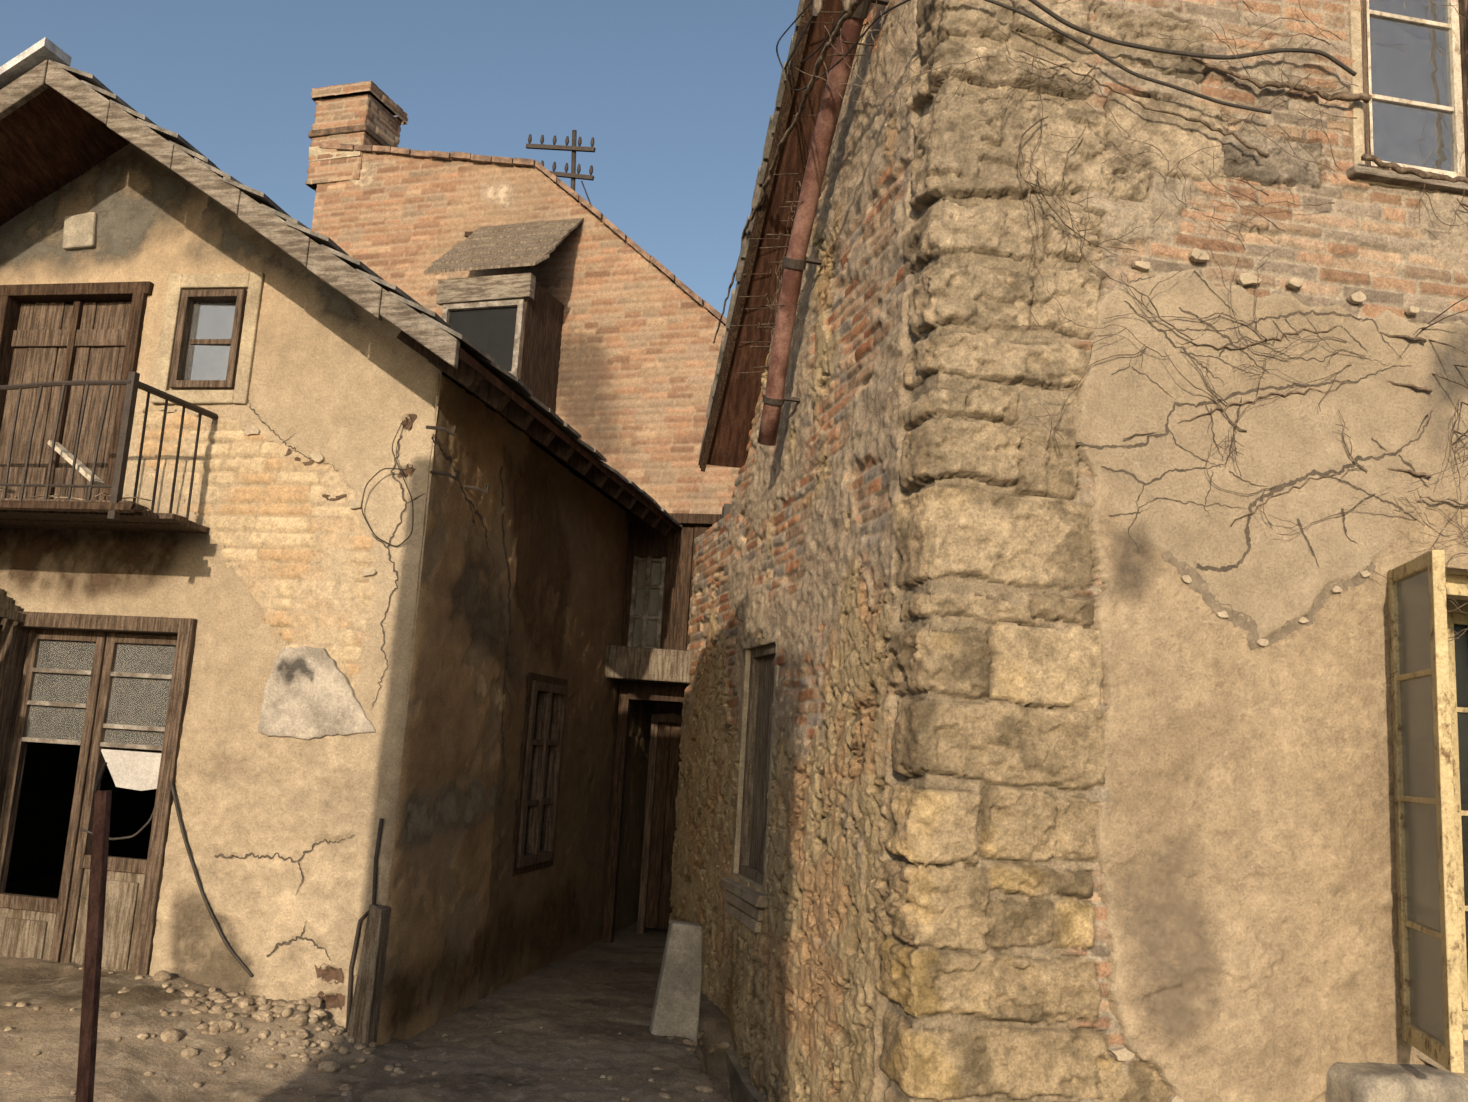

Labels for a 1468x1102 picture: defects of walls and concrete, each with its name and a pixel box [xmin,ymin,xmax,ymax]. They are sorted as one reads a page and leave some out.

flaking render [1127,7,1468,326]
flaking render [137,403,377,690]
flaking render [397,463,416,478]
flaking render [402,414,417,430]
crack [371,436,514,905]
damp [451,461,569,672]
crack [214,835,354,961]
flaking render [1096,1046,1183,1102]